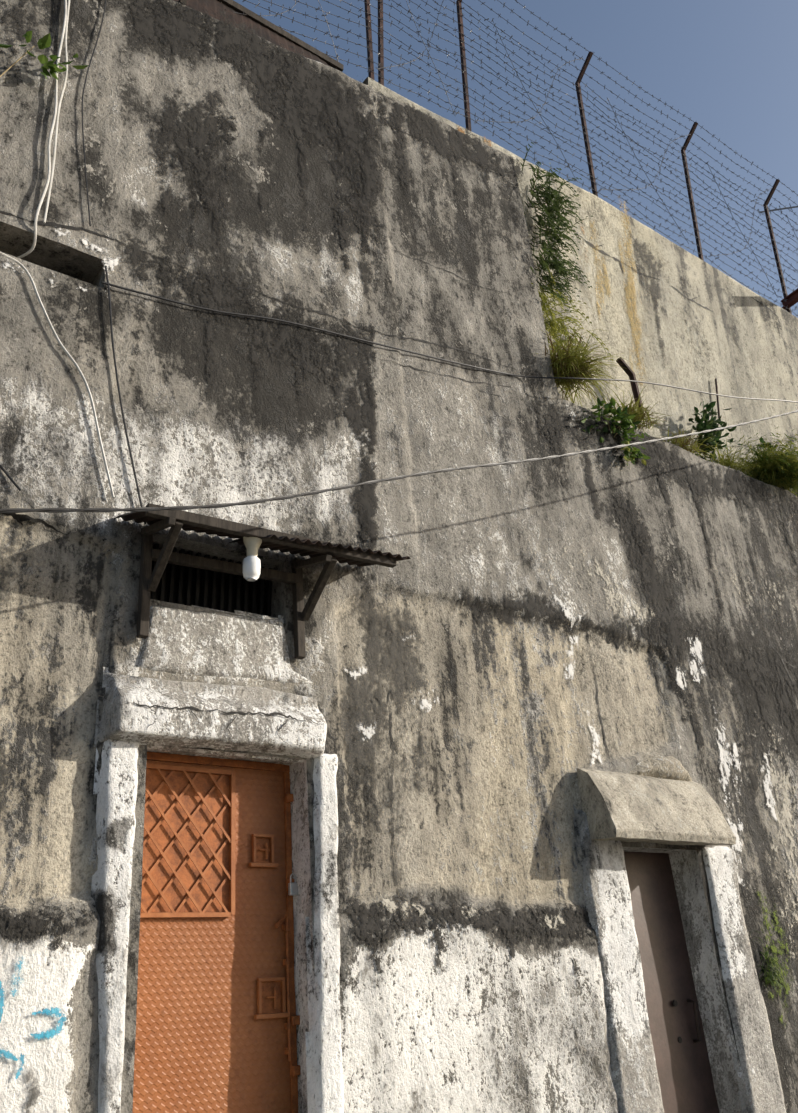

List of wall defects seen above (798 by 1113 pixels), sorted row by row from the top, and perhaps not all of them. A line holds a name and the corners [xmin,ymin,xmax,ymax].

leakage [116,0,523,299]
leakage [115,84,382,551]
crack [0,211,519,397]
leakage [759,301,787,356]
leakage [0,527,24,619]
crack [98,695,323,744]
leakage [339,565,599,987]
leakage [443,389,798,958]
leakage [0,902,98,951]